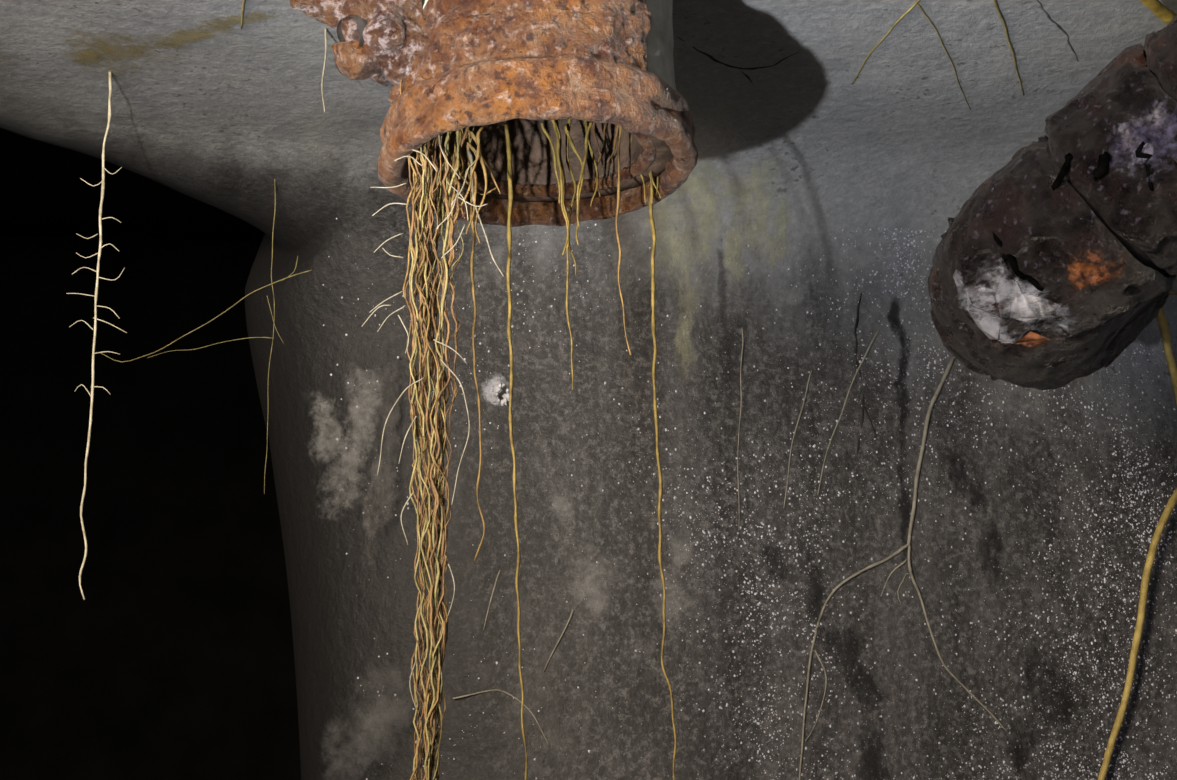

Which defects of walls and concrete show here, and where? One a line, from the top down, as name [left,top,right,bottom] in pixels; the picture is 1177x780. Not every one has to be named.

water stain [887,301,912,560]
water stain [979,526,1002,583]
water stain [825,628,882,703]